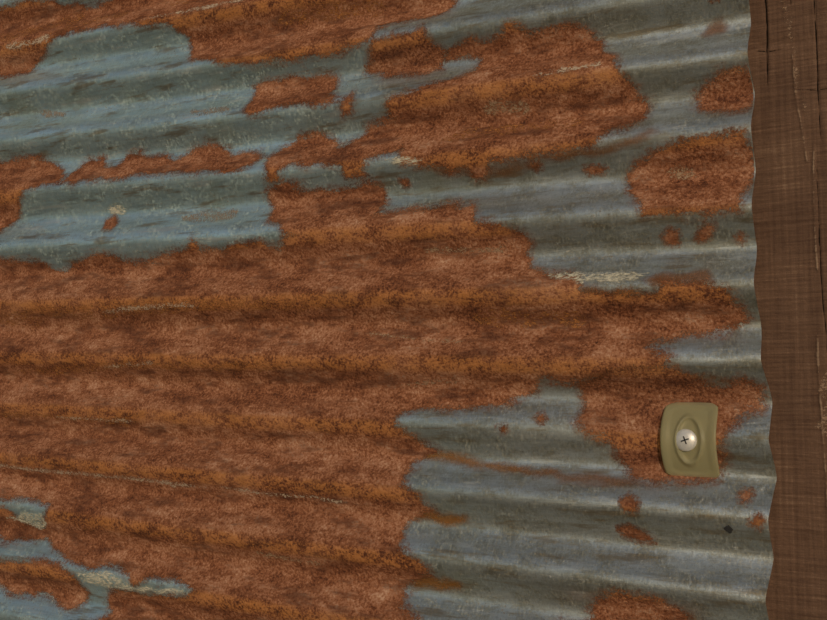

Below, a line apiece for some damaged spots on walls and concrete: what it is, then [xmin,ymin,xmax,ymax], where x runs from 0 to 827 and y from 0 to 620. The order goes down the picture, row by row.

rust [0,0,458,78]
rust [242,71,354,118]
rust [264,21,650,237]
rust [693,65,754,114]
rust [0,142,265,233]
rust [625,126,755,244]
rust [0,199,768,620]